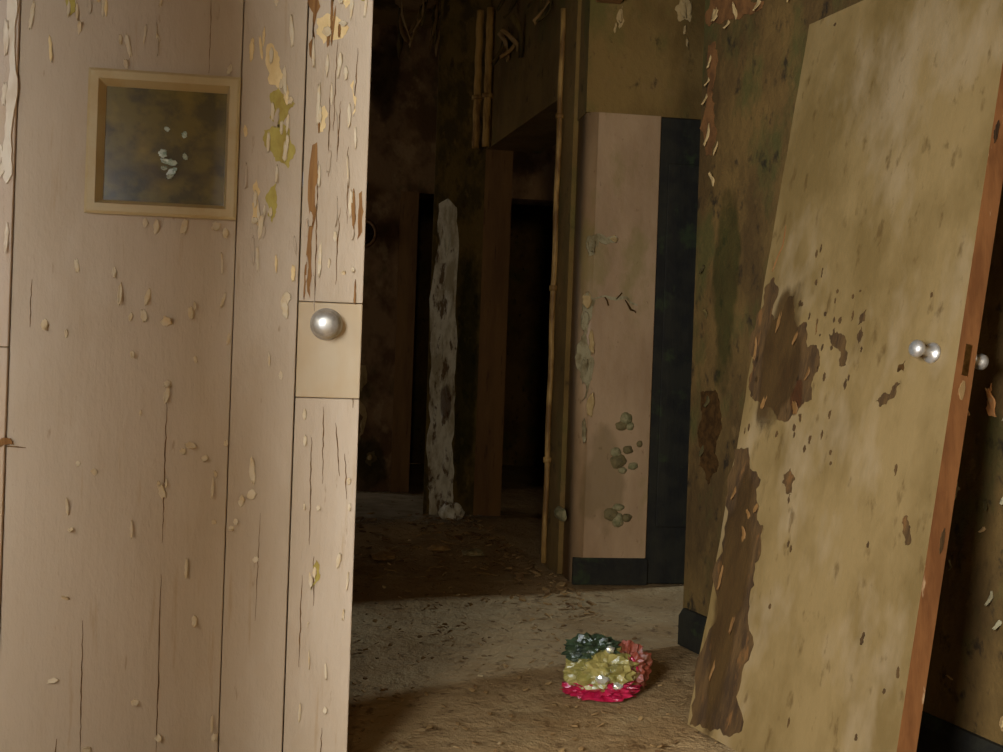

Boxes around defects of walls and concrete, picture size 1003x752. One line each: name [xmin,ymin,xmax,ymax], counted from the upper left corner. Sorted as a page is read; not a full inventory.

peeling [675,0,692,47]
peeling [705,0,764,29]
peeling [0,0,18,184]
peeling [700,41,718,156]
peeling [158,149,188,179]
peeling [244,26,296,271]
peeling [281,0,372,319]
peeling [426,199,459,517]
peeling [697,390,722,484]
peeling [985,383,1003,421]
peeling [741,503,759,541]
peeling [308,560,320,589]